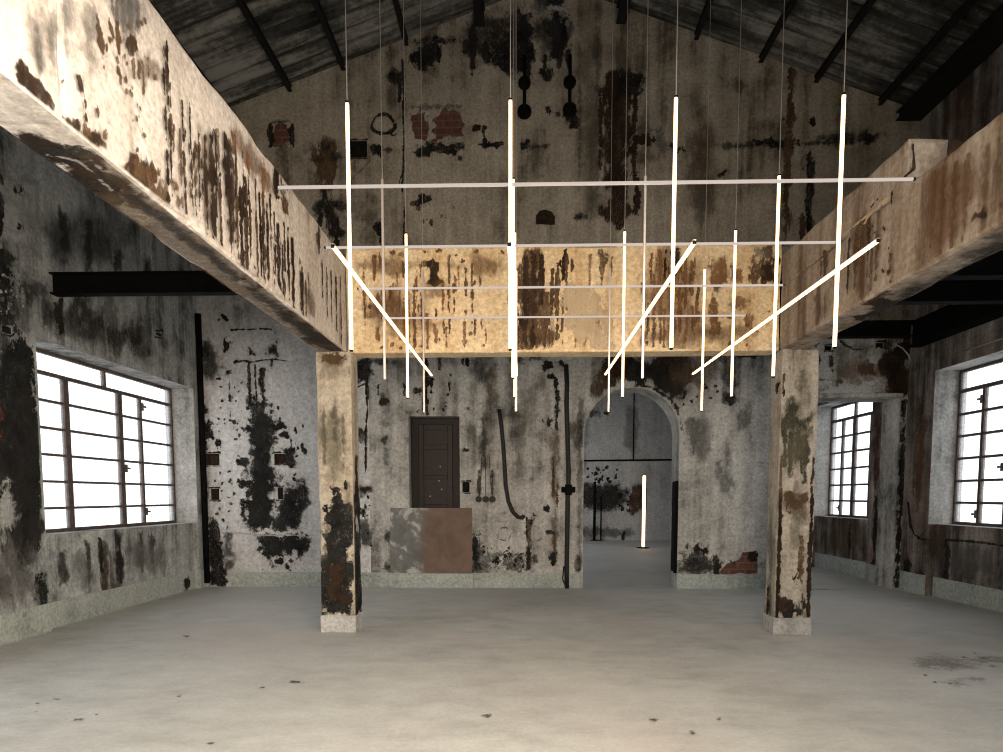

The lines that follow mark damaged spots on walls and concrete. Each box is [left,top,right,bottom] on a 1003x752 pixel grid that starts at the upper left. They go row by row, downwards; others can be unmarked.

corrosion [231,131,289,215]
spalling [350,112,397,159]
flaking render [410,103,487,144]
water stain [629,93,641,216]
corrosion [362,248,497,350]
corrosion [640,245,773,349]
corrosion [846,218,872,298]
water stain [845,288,911,322]
water stain [247,361,273,408]
water stain [782,429,811,519]
flaking render [713,551,758,574]
spalling [775,456,784,618]